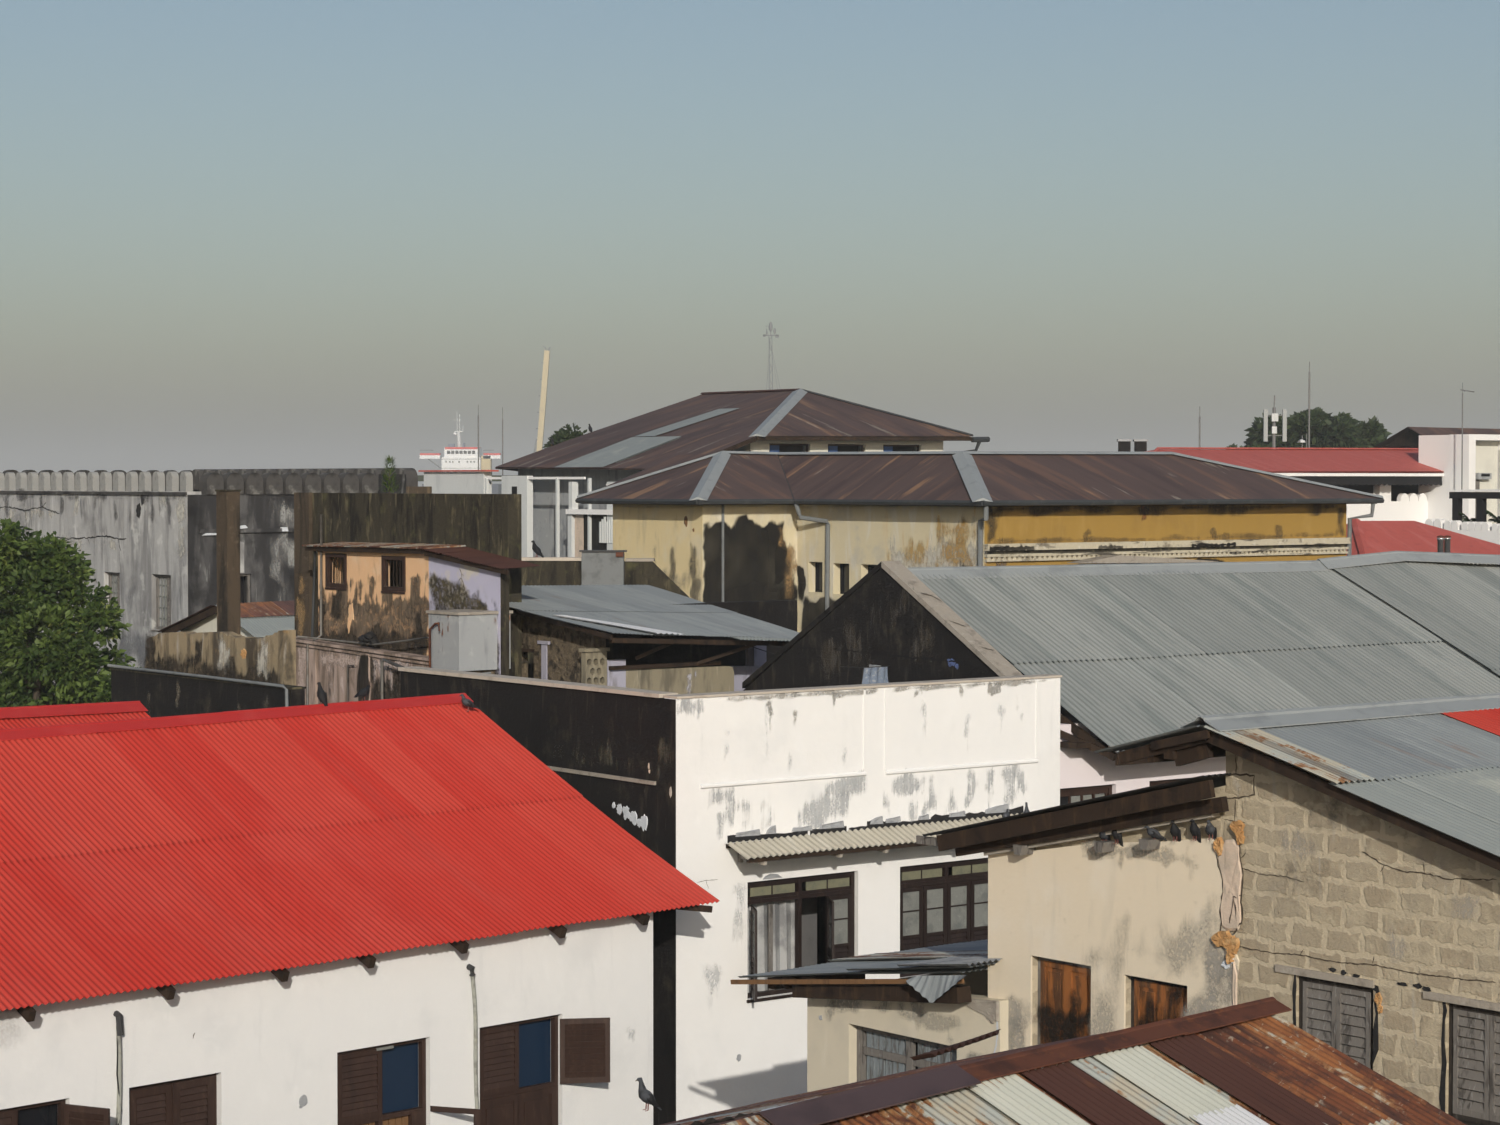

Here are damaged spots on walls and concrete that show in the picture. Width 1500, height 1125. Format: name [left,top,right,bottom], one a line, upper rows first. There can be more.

damp [272,505,487,701]
damp [670,515,835,630]
peeling [890,536,978,568]
damp [119,634,279,704]
spalling [727,804,1023,843]
damp [1086,842,1173,864]
flaking render [1213,820,1245,931]
crack [1216,755,1497,983]
damp [1139,921,1233,1025]
damp [1069,992,1113,1035]
corrosion [1068,1057,1199,1125]